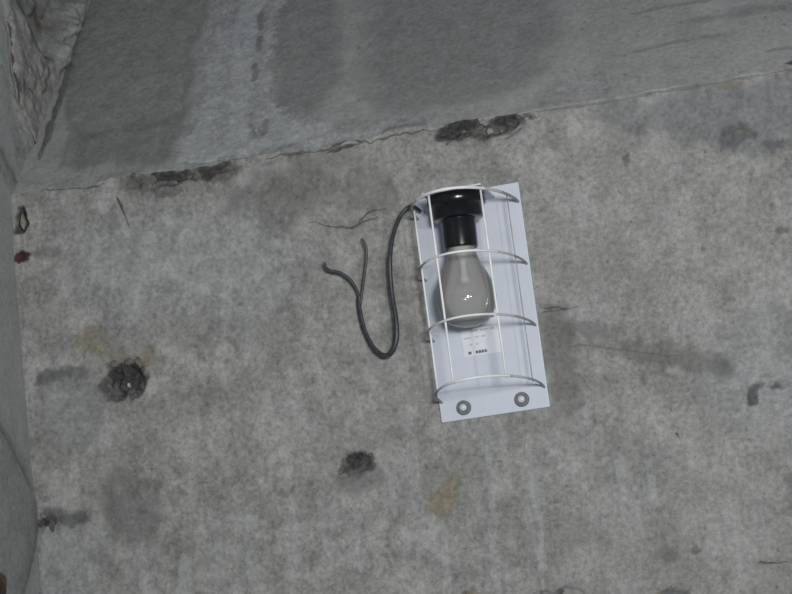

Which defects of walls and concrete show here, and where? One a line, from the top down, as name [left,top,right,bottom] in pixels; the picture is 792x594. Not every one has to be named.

crack [7,11,86,160]
crack [265,129,439,160]
spalling [435,113,539,145]
spalling [121,161,237,197]
corrosion [14,250,30,263]
spalling [98,357,149,403]
spalling [338,452,376,480]